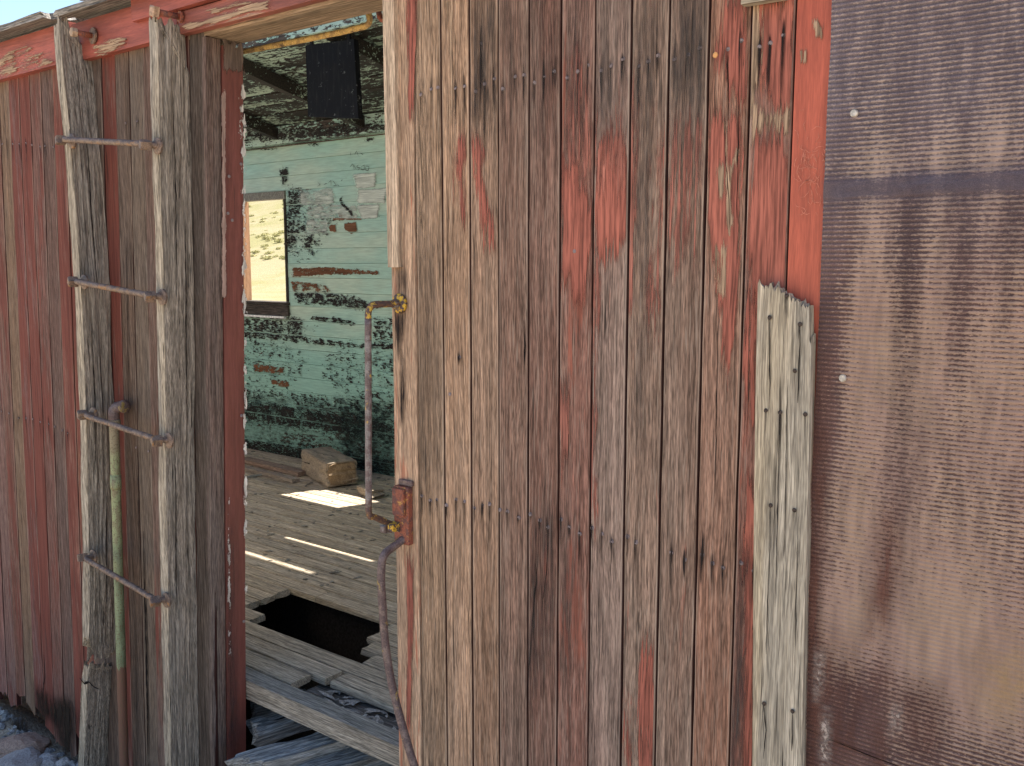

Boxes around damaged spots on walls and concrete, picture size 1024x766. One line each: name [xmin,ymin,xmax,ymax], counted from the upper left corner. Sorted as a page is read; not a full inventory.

peeling [0,46,53,76]
peeling [93,38,126,56]
peeling [239,84,385,169]
peeling [452,127,496,254]
peeling [242,166,395,476]
peeling [560,0,807,540]